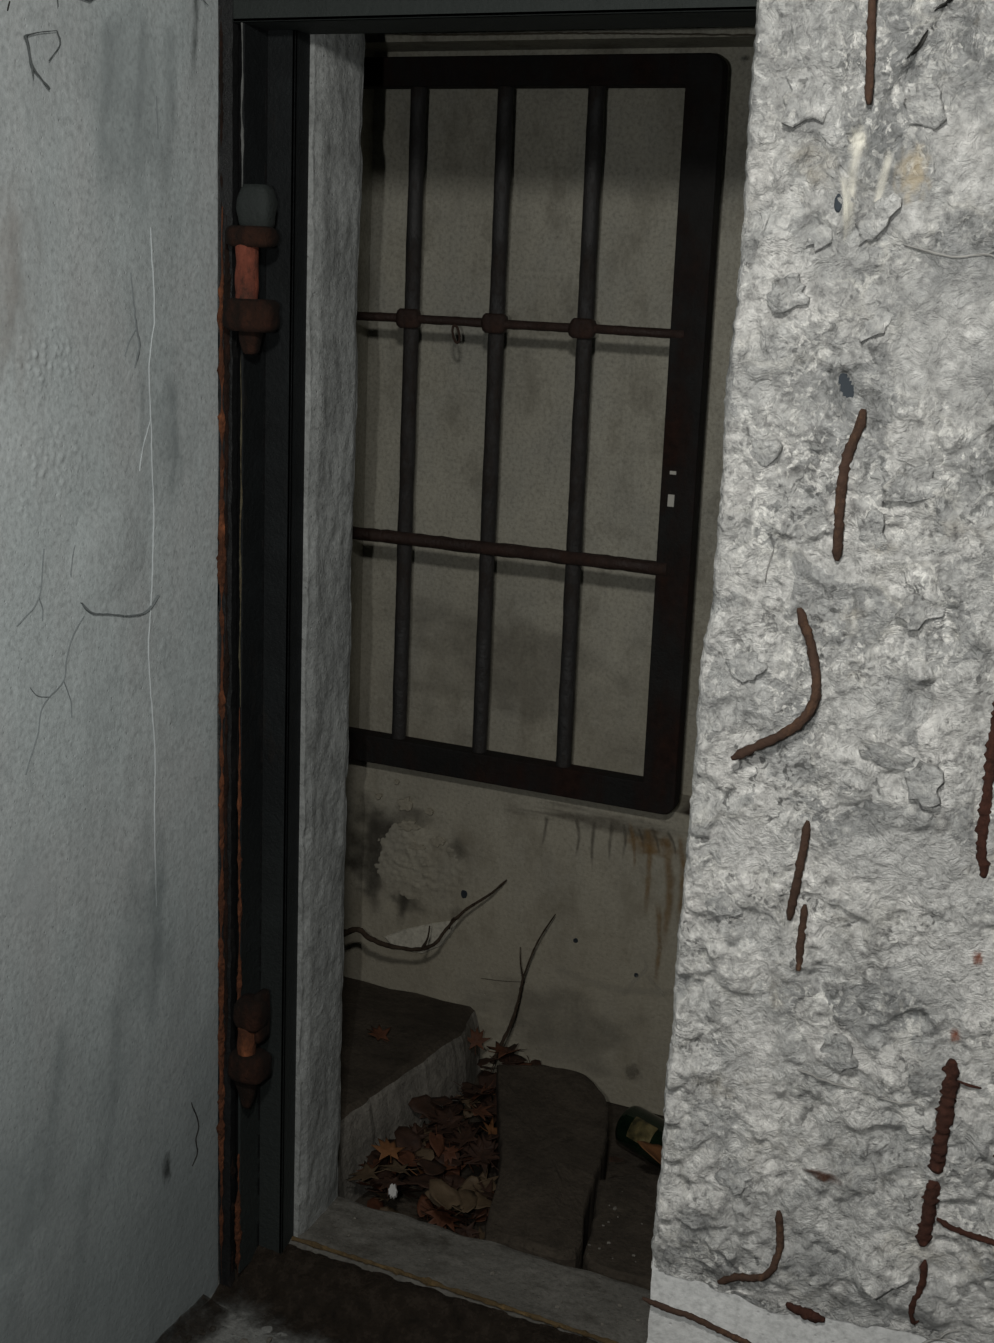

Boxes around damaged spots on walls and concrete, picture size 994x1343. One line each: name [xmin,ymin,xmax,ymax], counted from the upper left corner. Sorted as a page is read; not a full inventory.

spalling [642,0,994,1343]